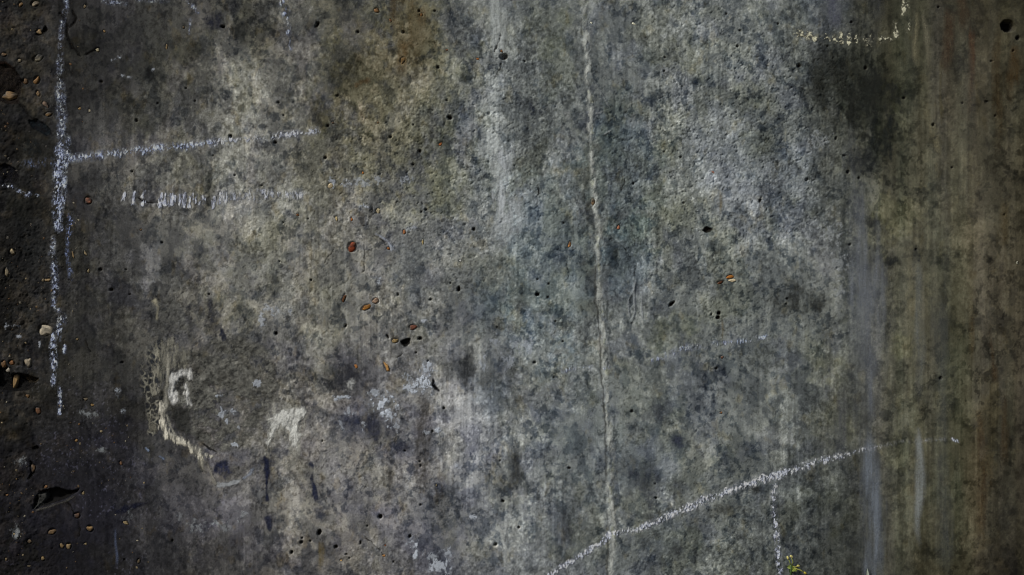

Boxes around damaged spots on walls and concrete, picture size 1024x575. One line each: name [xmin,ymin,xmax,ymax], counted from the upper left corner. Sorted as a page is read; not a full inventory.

spalling [143,336,306,487]
hole [34,487,79,511]
leakage [865,444,880,570]
leakage [915,436,924,528]